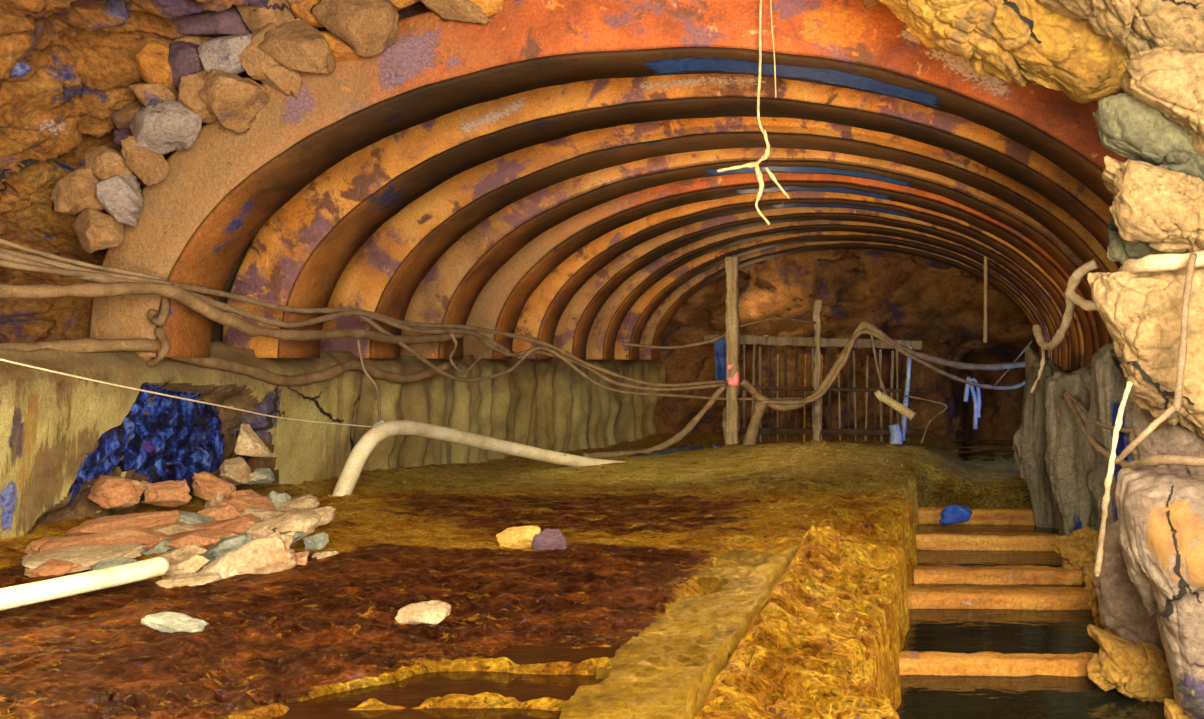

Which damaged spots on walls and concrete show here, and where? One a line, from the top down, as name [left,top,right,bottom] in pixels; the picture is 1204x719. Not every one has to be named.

rust [281,196,316,231]
crack [228,385,361,458]